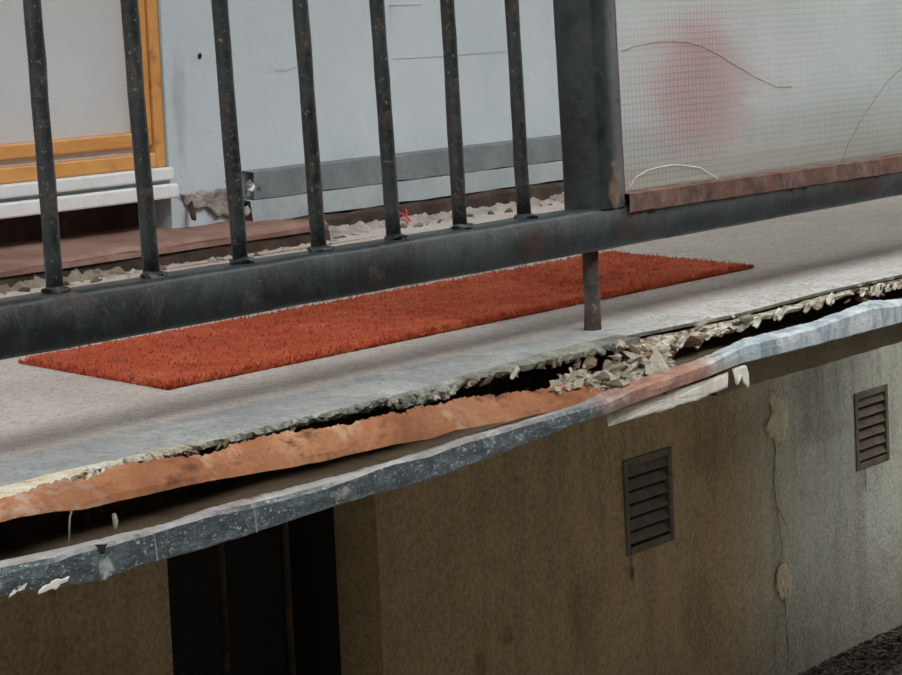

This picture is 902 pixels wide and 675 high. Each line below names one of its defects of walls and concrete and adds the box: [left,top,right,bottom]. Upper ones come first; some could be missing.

peeling [803,280,902,314]
spalling [355,314,761,427]
spalling [215,420,296,451]
spalling [123,448,201,464]
crack [772,447,790,645]
peeling [99,557,113,579]